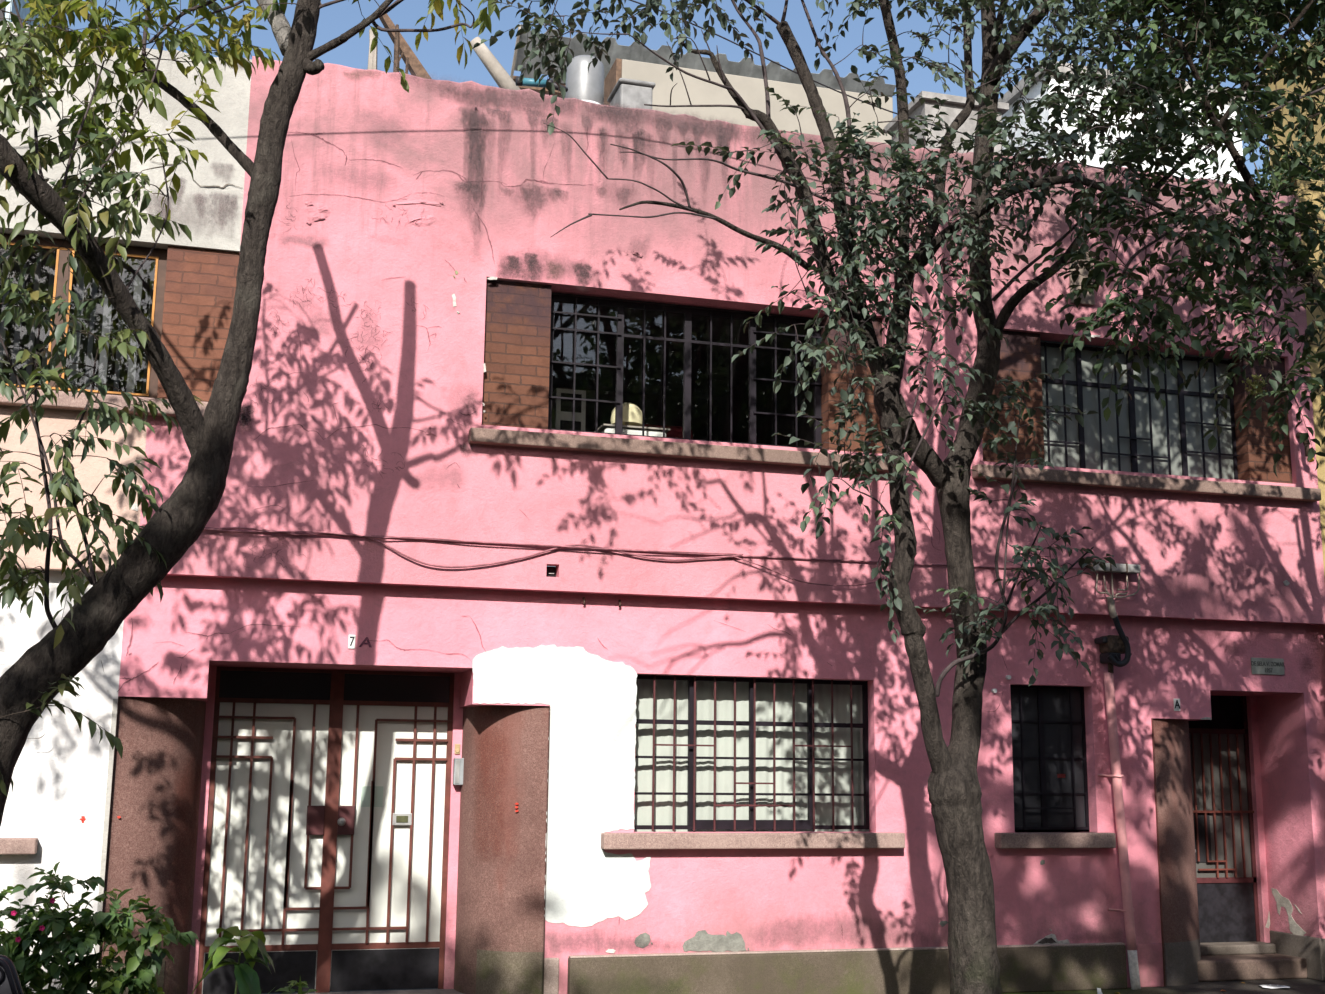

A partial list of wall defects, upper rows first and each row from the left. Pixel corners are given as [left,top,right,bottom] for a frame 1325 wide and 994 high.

crack [290,132,592,259]
water stain [503,254,559,279]
crack [254,403,426,440]
crack [101,622,297,692]
crack [367,616,483,654]
peeling [1265,888,1306,936]